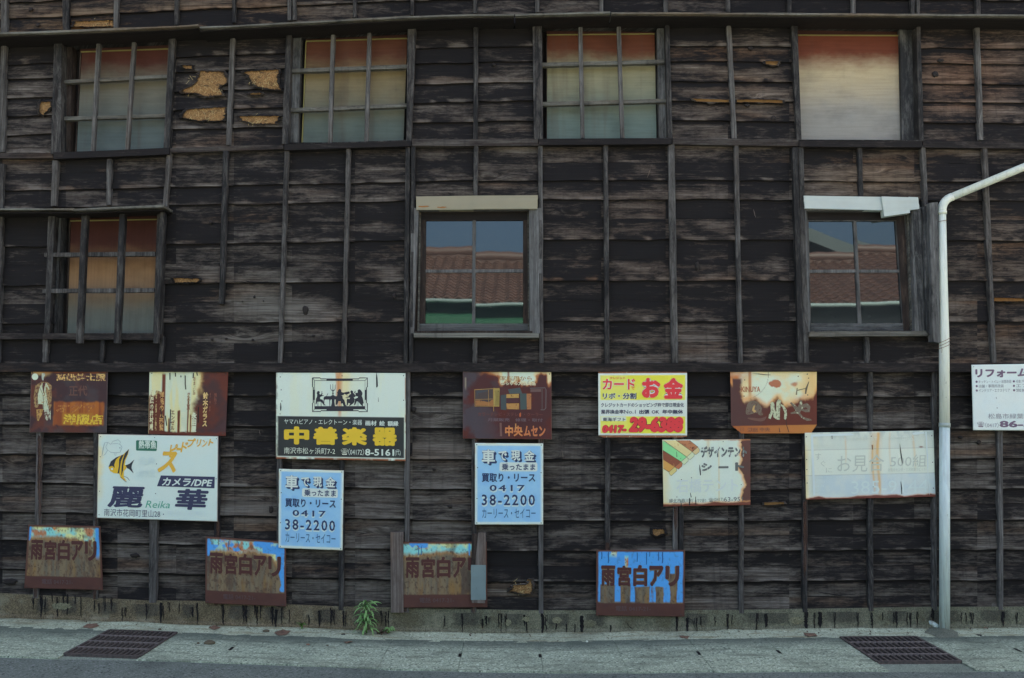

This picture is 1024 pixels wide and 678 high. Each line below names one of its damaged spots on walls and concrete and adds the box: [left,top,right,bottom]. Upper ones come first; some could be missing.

leakage [32,593,127,622]
leakage [145,602,199,625]
leakage [242,605,290,627]
leakage [308,608,347,627]
leakage [523,613,584,633]
leakage [676,614,733,632]
leakage [804,612,836,628]
leakage [856,608,934,628]